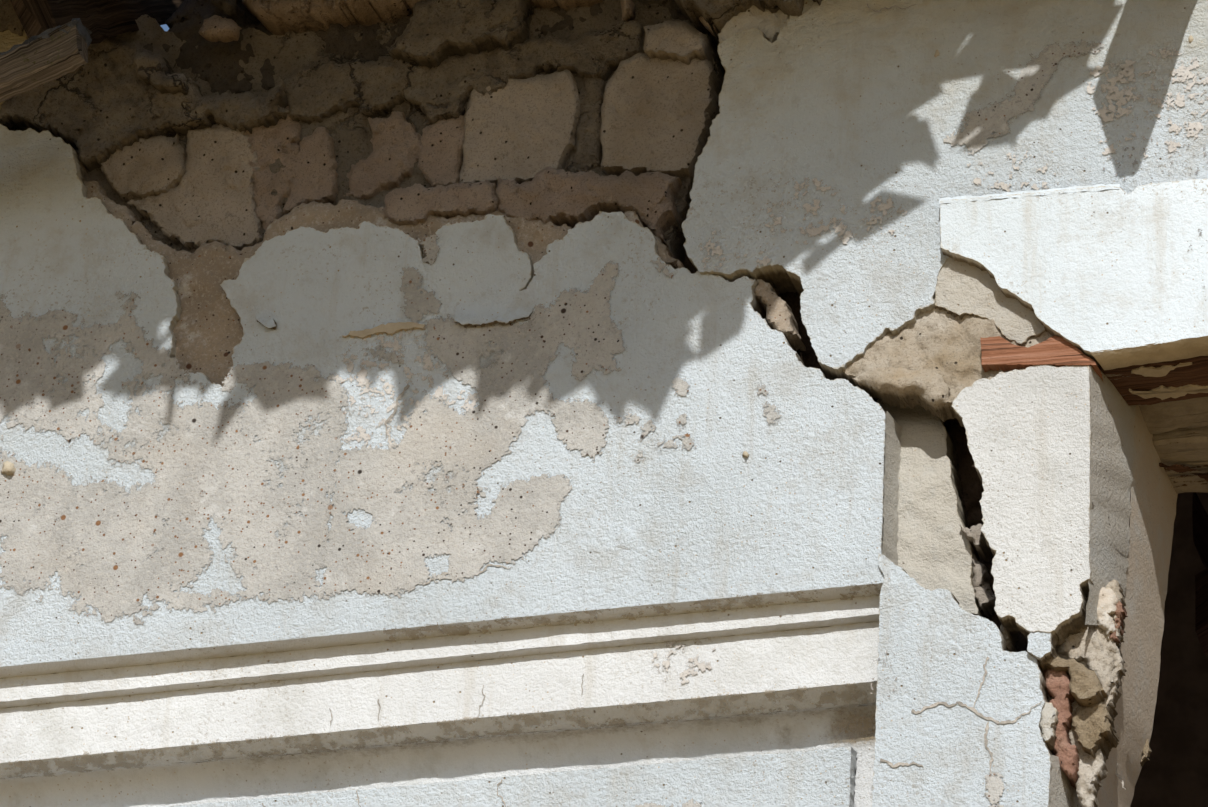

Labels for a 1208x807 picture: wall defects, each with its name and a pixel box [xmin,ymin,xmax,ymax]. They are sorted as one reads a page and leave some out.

peeling [943,40,1208,193]
spalling [0,0,908,625]
crack [683,253,696,274]
crack [754,279,828,379]
spalling [842,257,1103,422]
crack [911,418,1043,776]
crack [880,759,924,768]
spalling [1027,579,1128,807]
spalling [1140,739,1152,766]